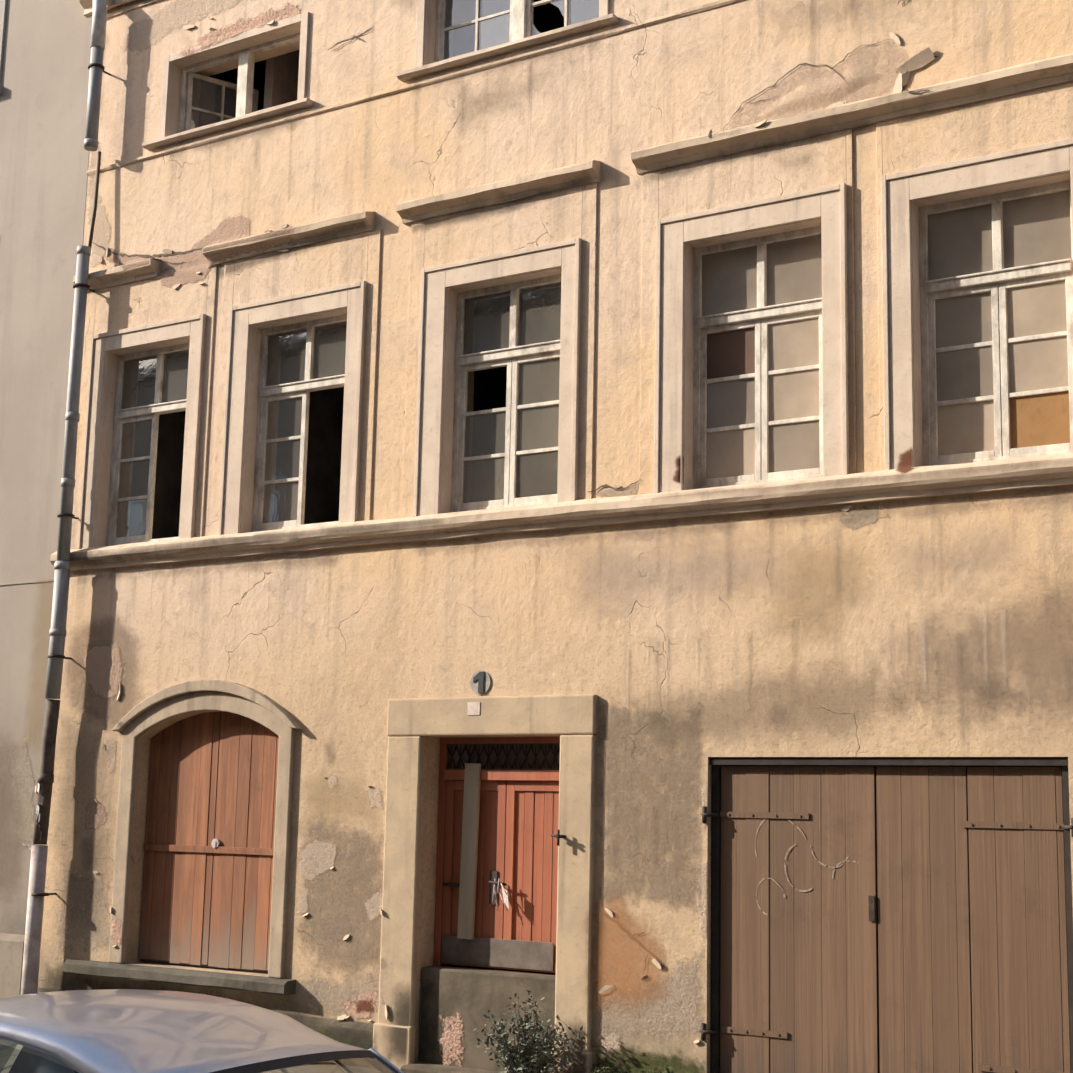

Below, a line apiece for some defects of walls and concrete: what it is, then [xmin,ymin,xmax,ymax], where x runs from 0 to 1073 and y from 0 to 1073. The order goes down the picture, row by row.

flaking render [893,73,903,94]
flaking render [87,148,294,289]
flaking render [83,644,122,701]
water stain [602,708,699,905]
flaking render [297,839,337,917]